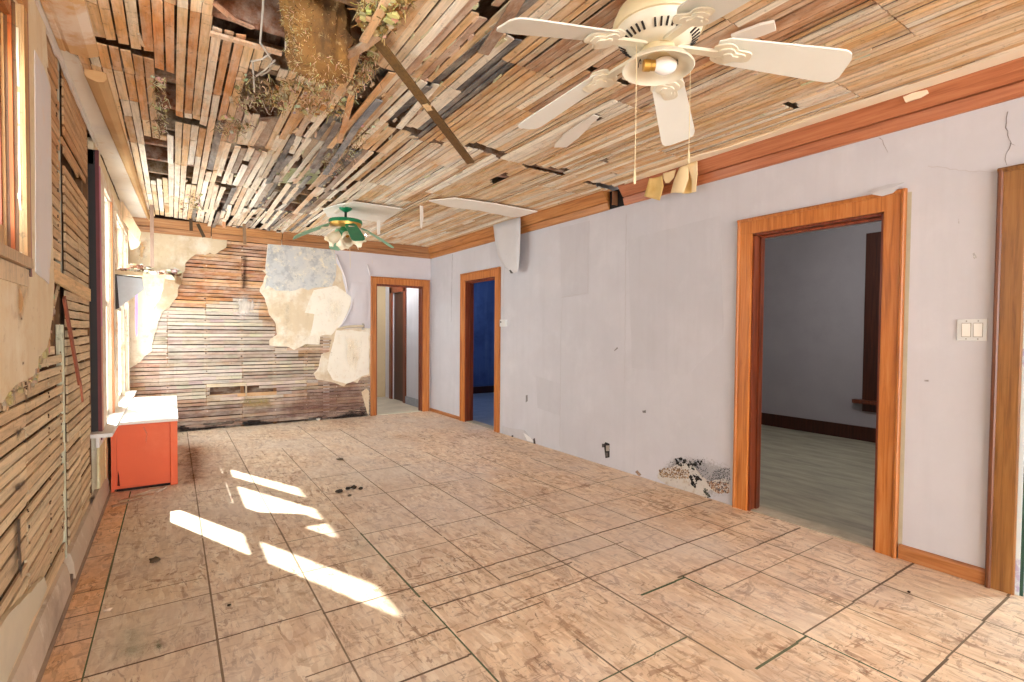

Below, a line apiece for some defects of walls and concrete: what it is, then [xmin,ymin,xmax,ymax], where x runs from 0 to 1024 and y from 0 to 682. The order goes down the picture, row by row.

flaking render [209,384,277,398]